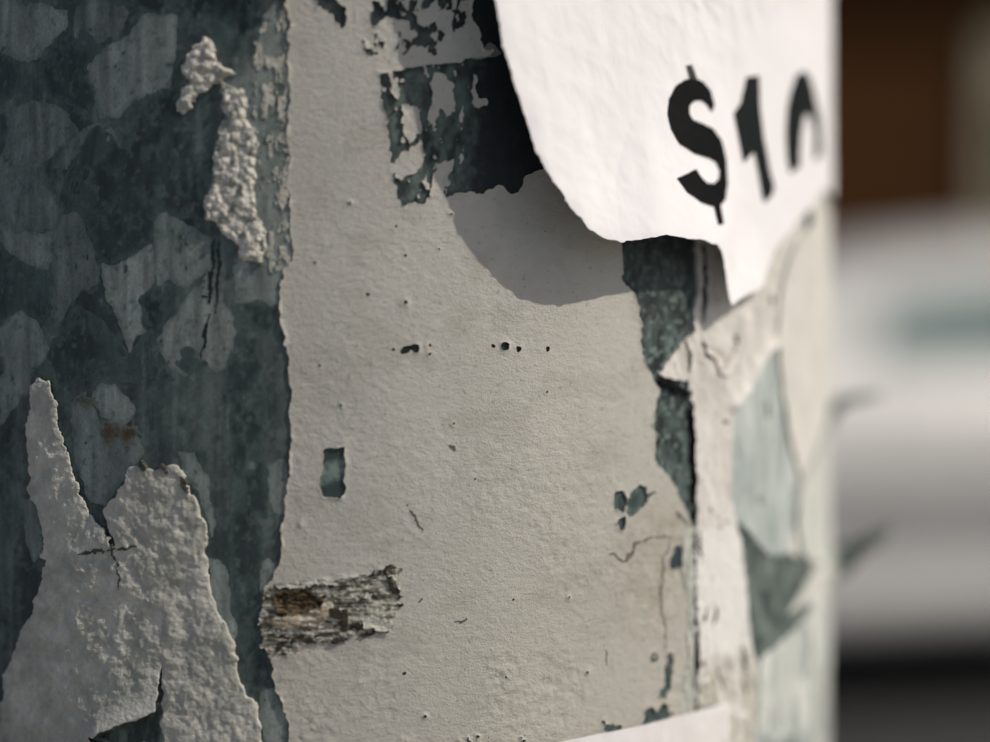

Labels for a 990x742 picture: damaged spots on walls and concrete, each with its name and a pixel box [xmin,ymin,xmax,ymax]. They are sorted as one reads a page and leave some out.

peeling [252,9,292,272]
peeling [317,0,347,29]
peeling [363,0,545,207]
peeling [621,235,695,524]
crack [701,245,709,324]
peeling [0,377,262,742]
spalling [614,485,655,531]
crack [609,380,701,712]
spalling [670,546,682,570]
peeling [730,350,812,661]
spalling [601,720,621,732]
spalling [642,652,673,725]